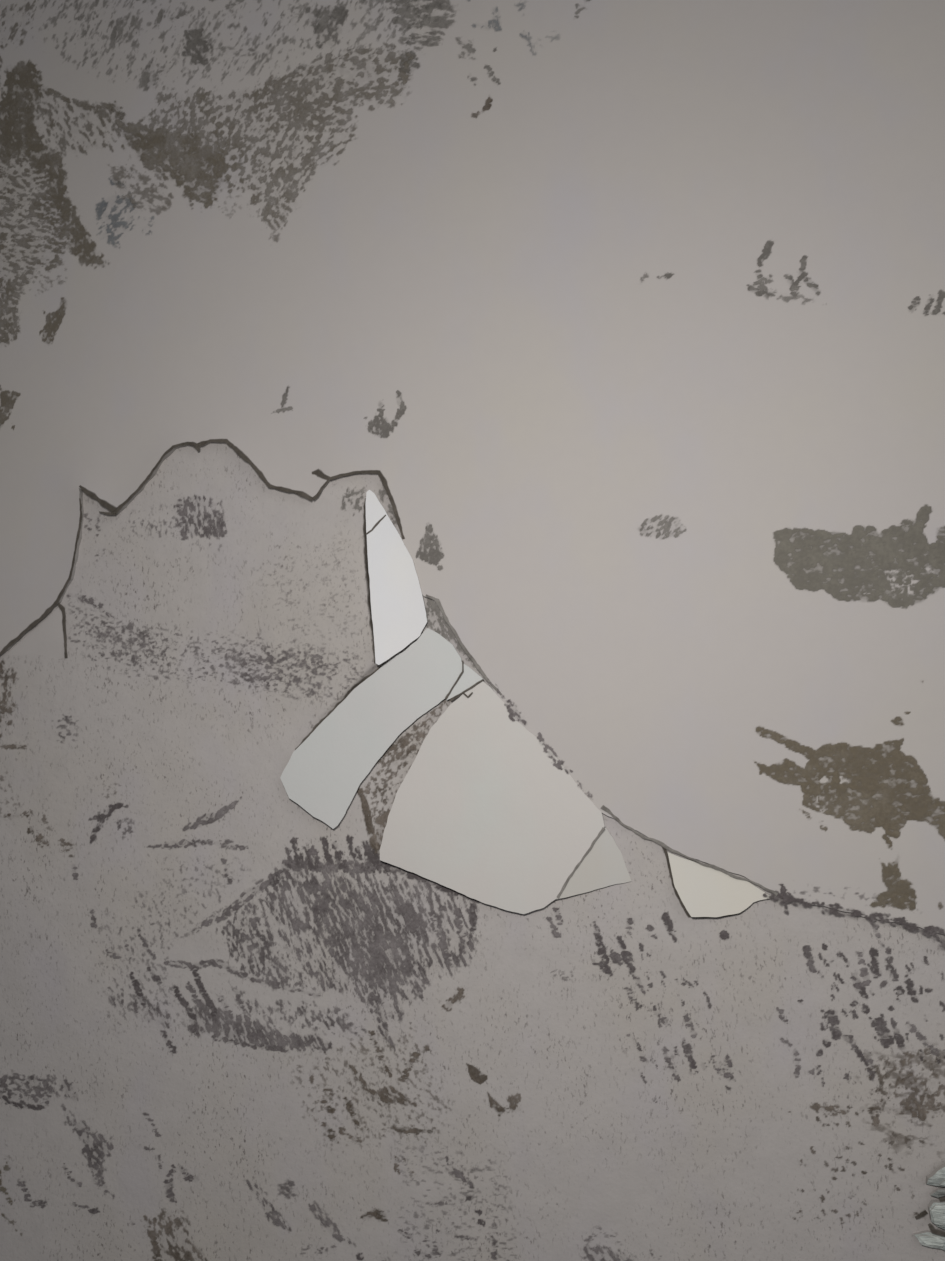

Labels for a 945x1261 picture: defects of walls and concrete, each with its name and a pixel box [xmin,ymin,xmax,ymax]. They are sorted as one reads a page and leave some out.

peeling [0,0,475,343]
peeling [0,443,945,1261]